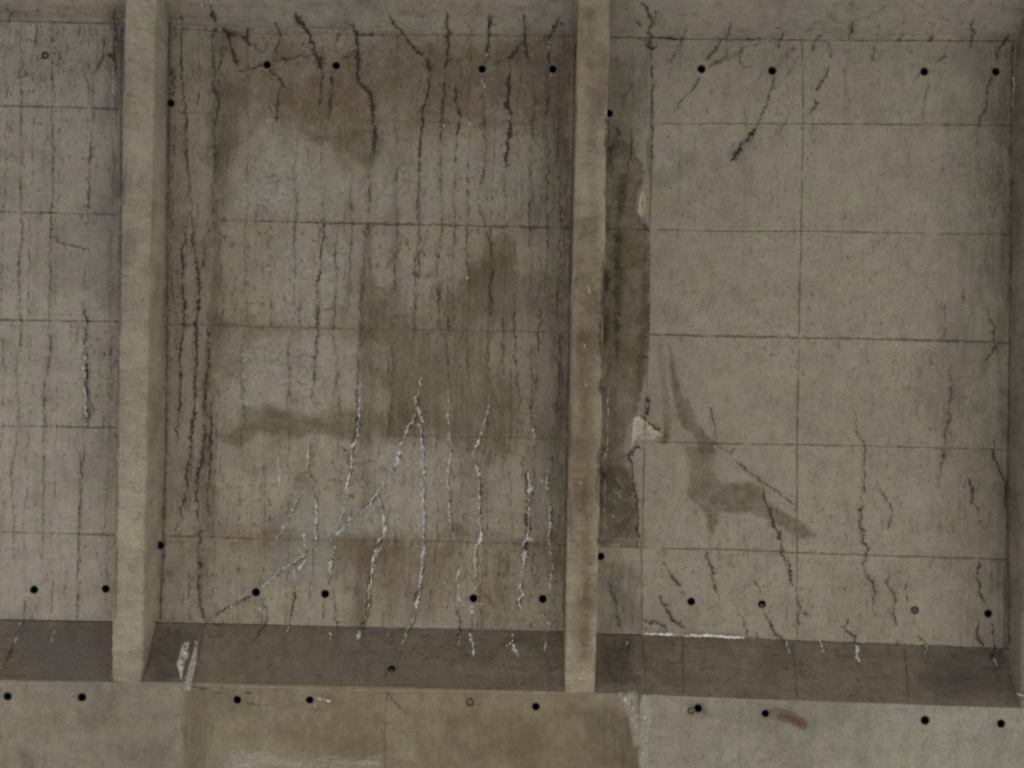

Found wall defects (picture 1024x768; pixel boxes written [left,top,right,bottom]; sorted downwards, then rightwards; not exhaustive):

crack [608,3,904,170]
crack [82,310,90,422]
crack [171,37,296,640]
leakage [228,393,402,618]
crack [207,2,564,465]
leakage [377,298,508,643]
leakage [518,445,562,615]
leakage [598,119,648,545]
spalling [631,416,663,448]
crack [645,405,809,647]
crack [853,413,925,645]
leakage [167,641,198,689]